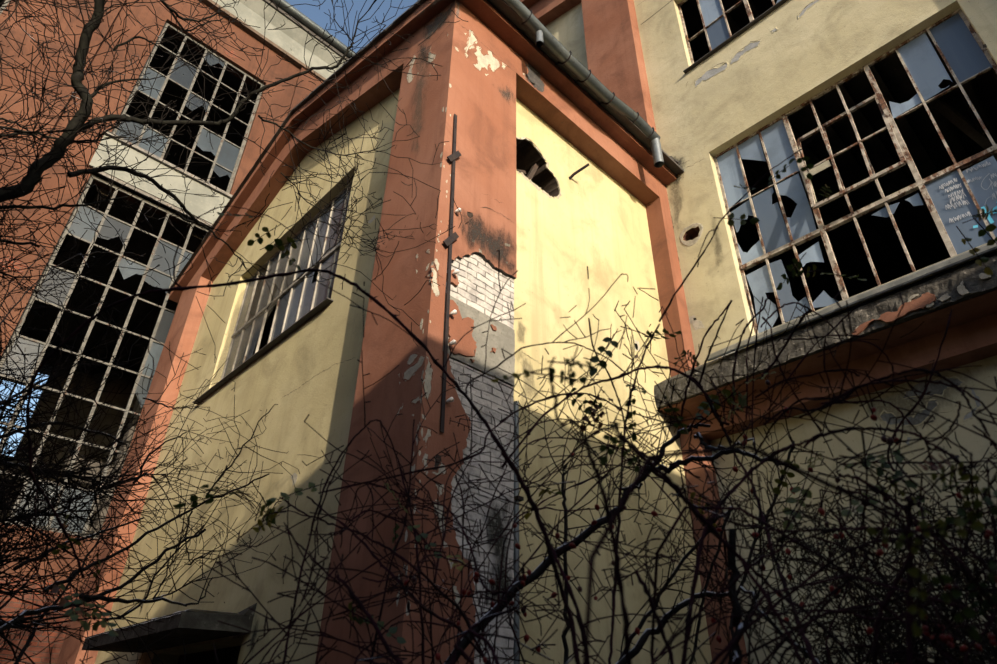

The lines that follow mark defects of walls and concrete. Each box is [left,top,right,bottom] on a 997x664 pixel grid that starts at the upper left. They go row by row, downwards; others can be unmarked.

peeling [455,30,508,76]
peeling [514,50,545,93]
spalling [516,137,562,199]
damp [462,216,515,270]
spalling [679,223,703,247]
peeling [845,281,971,340]
flaking render [396,221,515,664]